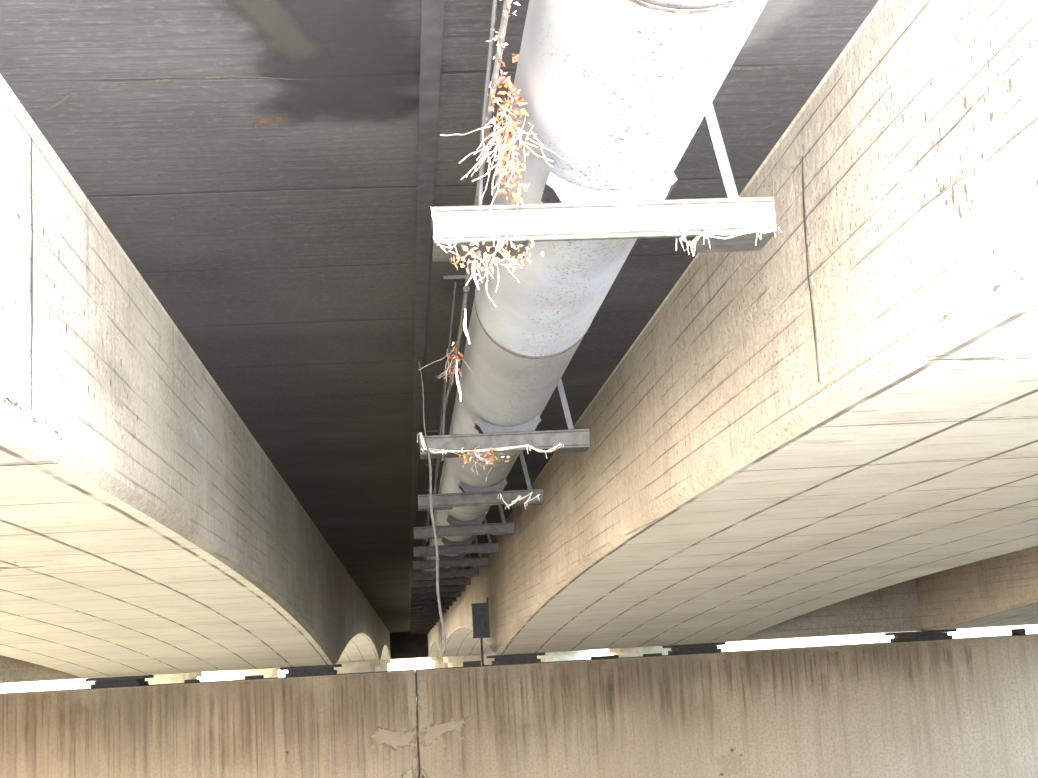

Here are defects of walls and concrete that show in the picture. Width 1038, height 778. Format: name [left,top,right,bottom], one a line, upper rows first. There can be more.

water stain [238,0,420,119]
crack [28,137,36,411]
crack [802,156,819,383]
peeling [371,718,467,778]